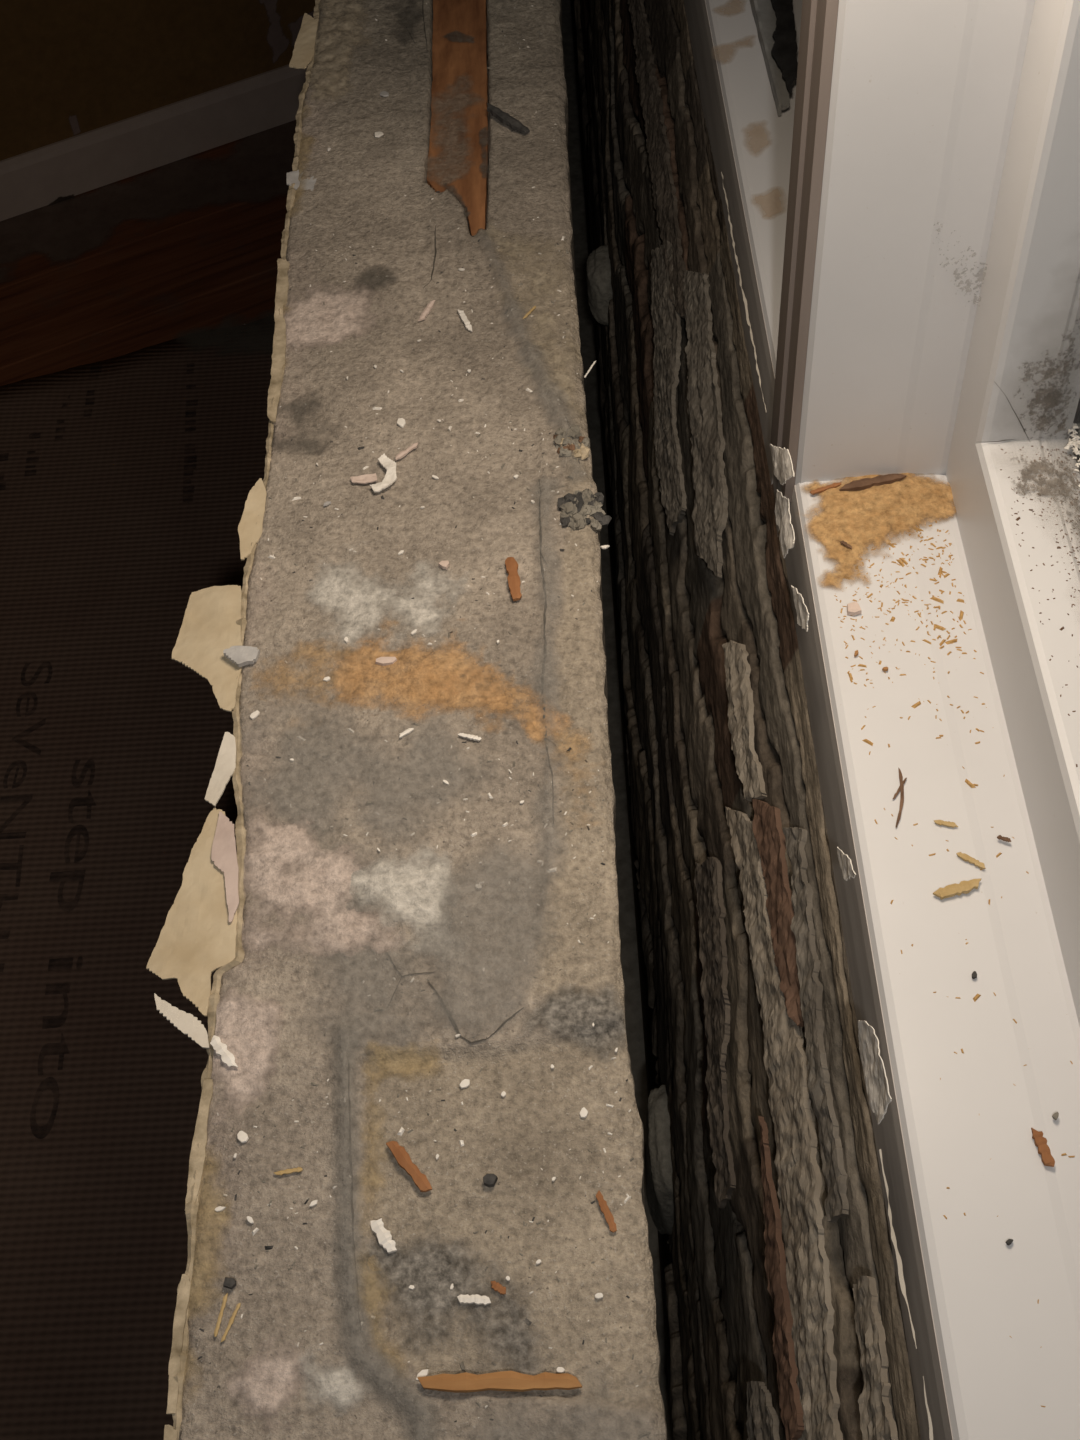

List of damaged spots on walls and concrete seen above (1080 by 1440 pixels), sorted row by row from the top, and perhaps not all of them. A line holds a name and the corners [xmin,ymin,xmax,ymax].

spalling [289,0,369,100]
damp [1014,318,1080,439]
peeling [238,478,267,560]
damp [1011,454,1080,534]
peeling [172,585,242,712]
peeling [146,732,239,1049]